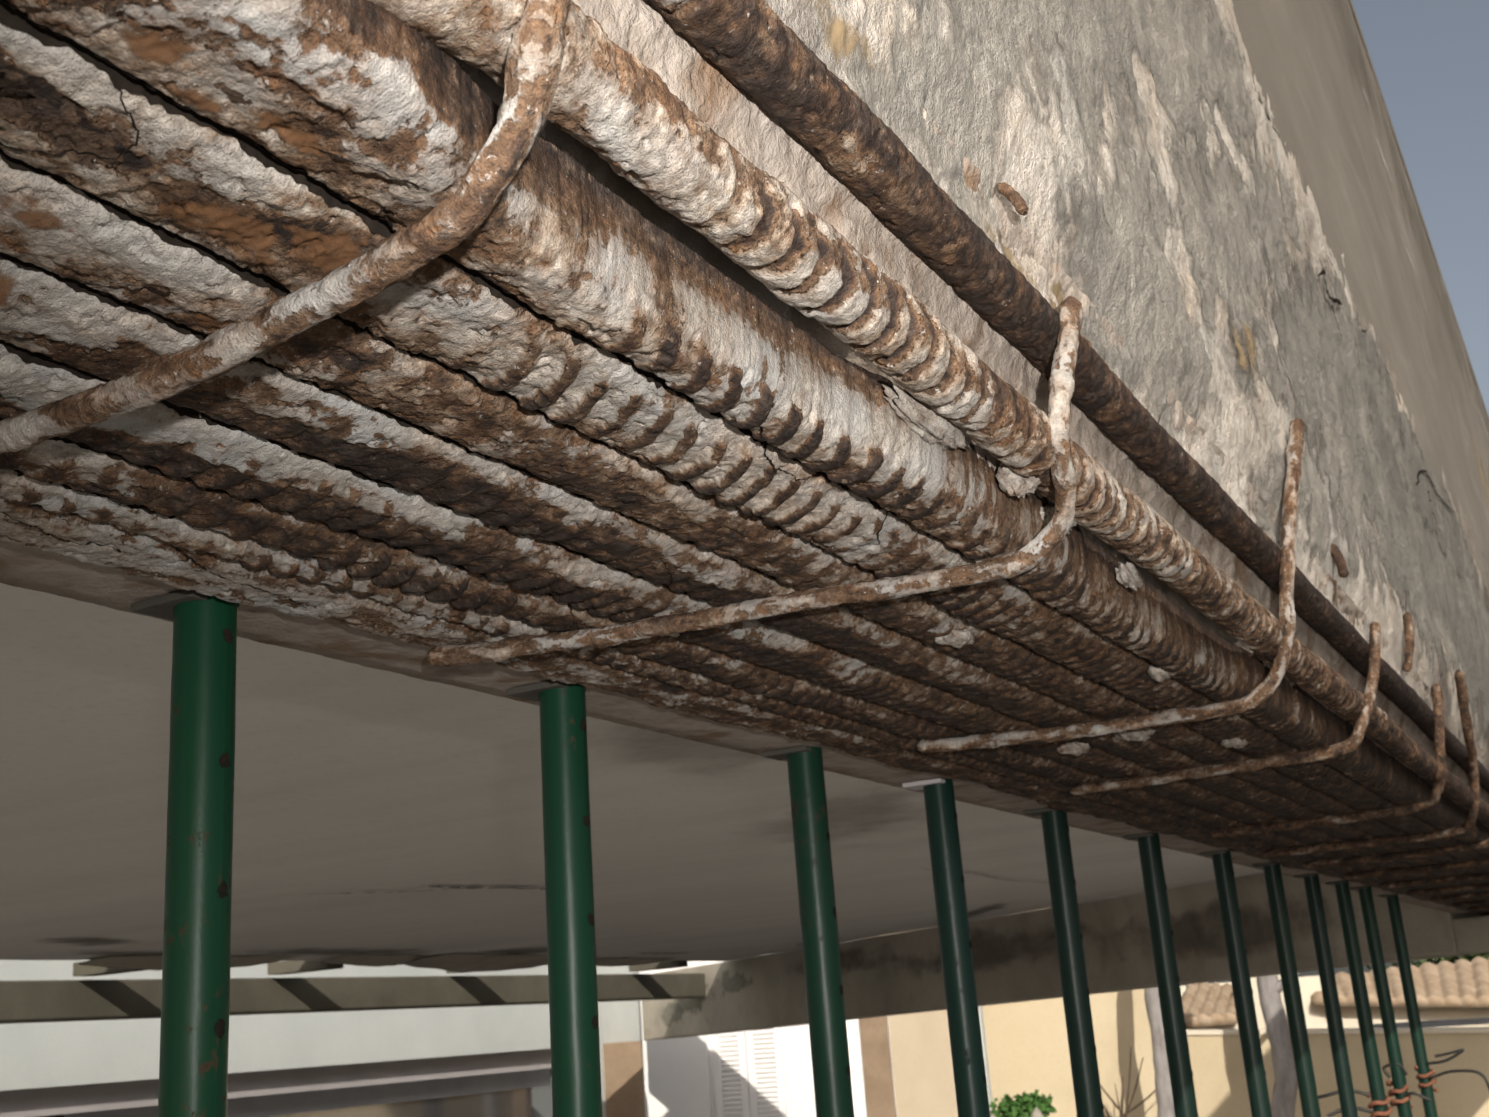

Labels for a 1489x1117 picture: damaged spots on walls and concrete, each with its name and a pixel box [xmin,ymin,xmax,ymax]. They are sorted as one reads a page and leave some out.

rust [123,17,221,113]
rust [249,109,321,155]
rust [1,195,70,230]
rust [162,201,366,273]
rust [1051,281,1063,311]
rust [196,312,235,331]
spalling [0,0,1055,648]
spalling [495,0,1489,915]
peeling [77,955,163,971]
peeling [230,955,302,968]
peeling [322,952,548,972]
peeling [596,956,675,967]